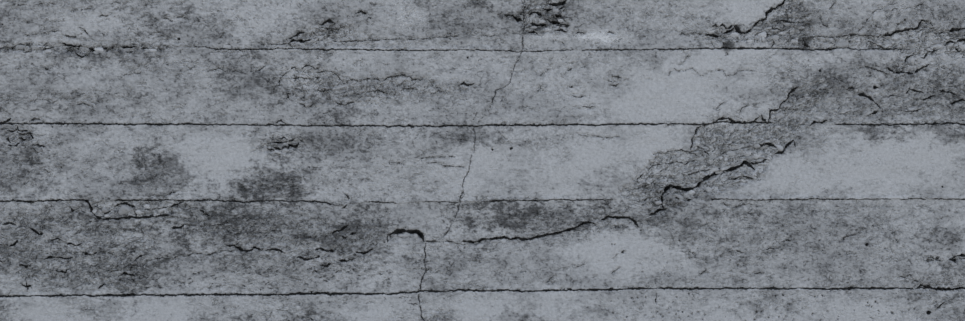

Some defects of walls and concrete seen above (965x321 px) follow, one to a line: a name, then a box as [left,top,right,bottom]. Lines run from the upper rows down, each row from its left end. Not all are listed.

crack [332,35,458,43]
crack [387,1,651,321]
peeling [504,0,584,35]
spalling [616,0,965,217]